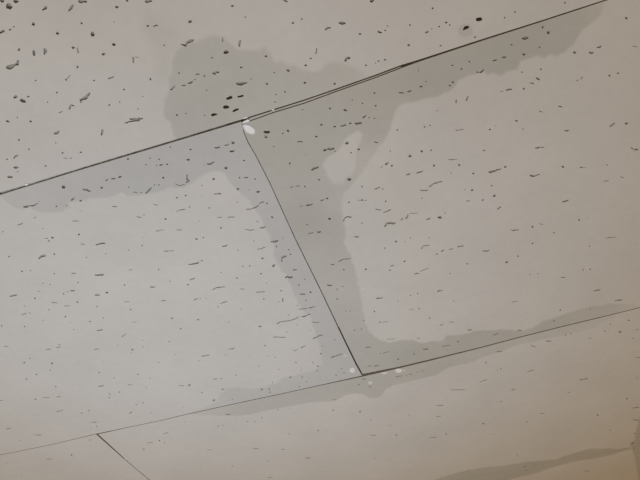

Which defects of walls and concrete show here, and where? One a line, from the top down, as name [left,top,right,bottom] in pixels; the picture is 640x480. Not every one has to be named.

water stain [137,3,370,140]
water stain [0,122,617,416]
water stain [241,0,640,374]